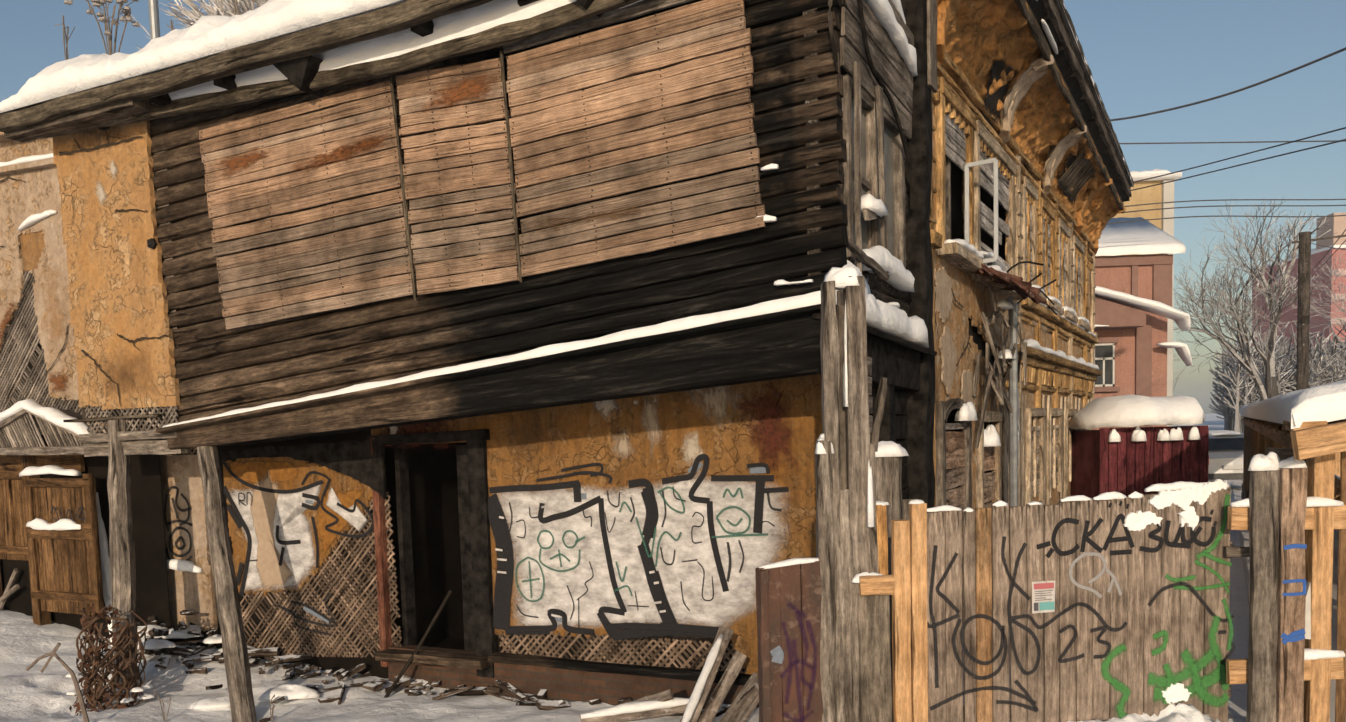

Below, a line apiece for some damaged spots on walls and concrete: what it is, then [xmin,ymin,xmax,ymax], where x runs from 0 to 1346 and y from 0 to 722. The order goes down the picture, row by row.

flaking render [1005,59,1047,125]
crack [59,129,142,156]
flaking render [1046,131,1080,182]
crack [115,206,147,214]
flaking render [0,231,82,415]
crack [45,325,121,406]
crack [117,333,169,350]
flaking render [934,267,975,404]